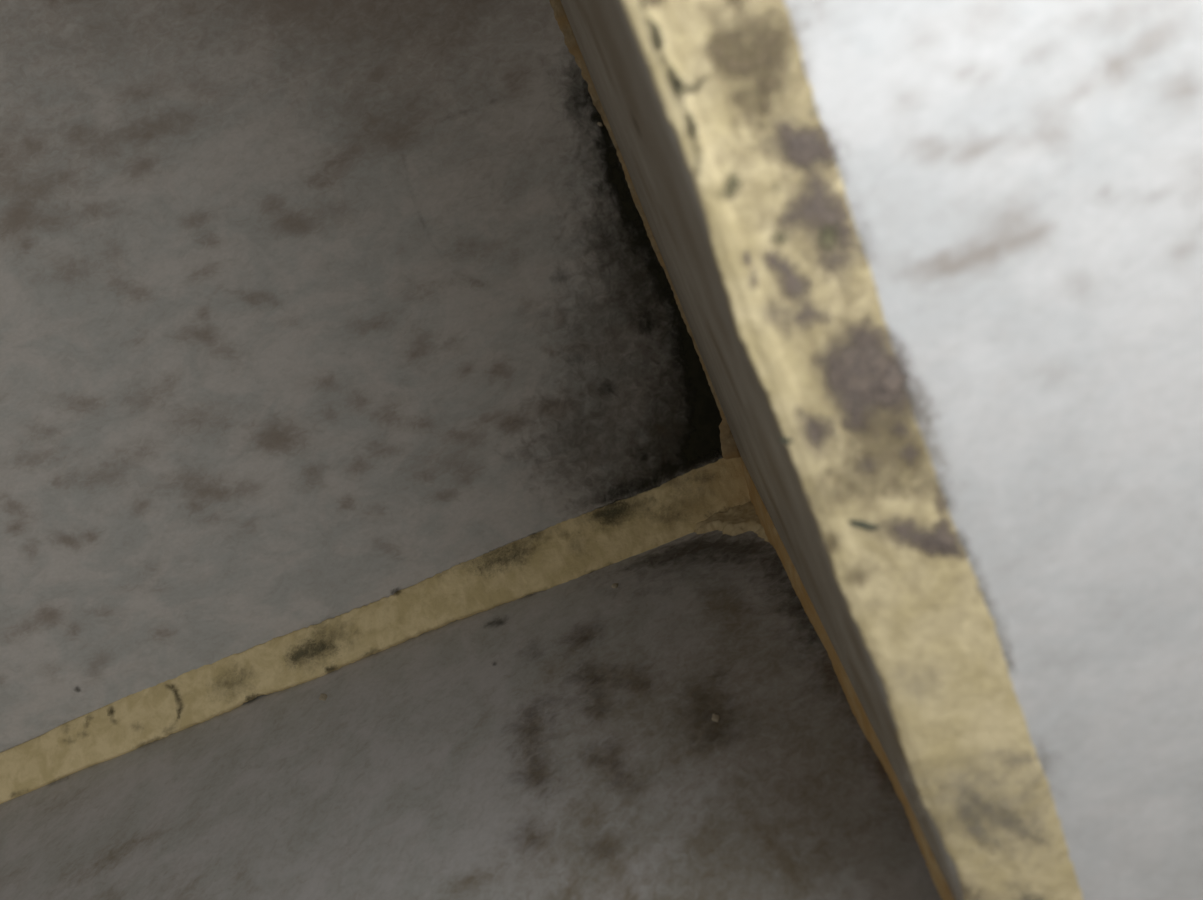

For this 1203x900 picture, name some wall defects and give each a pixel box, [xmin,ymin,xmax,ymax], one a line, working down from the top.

leakage [576,92,723,520]
leakage [745,126,850,327]
leakage [806,326,925,471]
leakage [890,489,962,556]